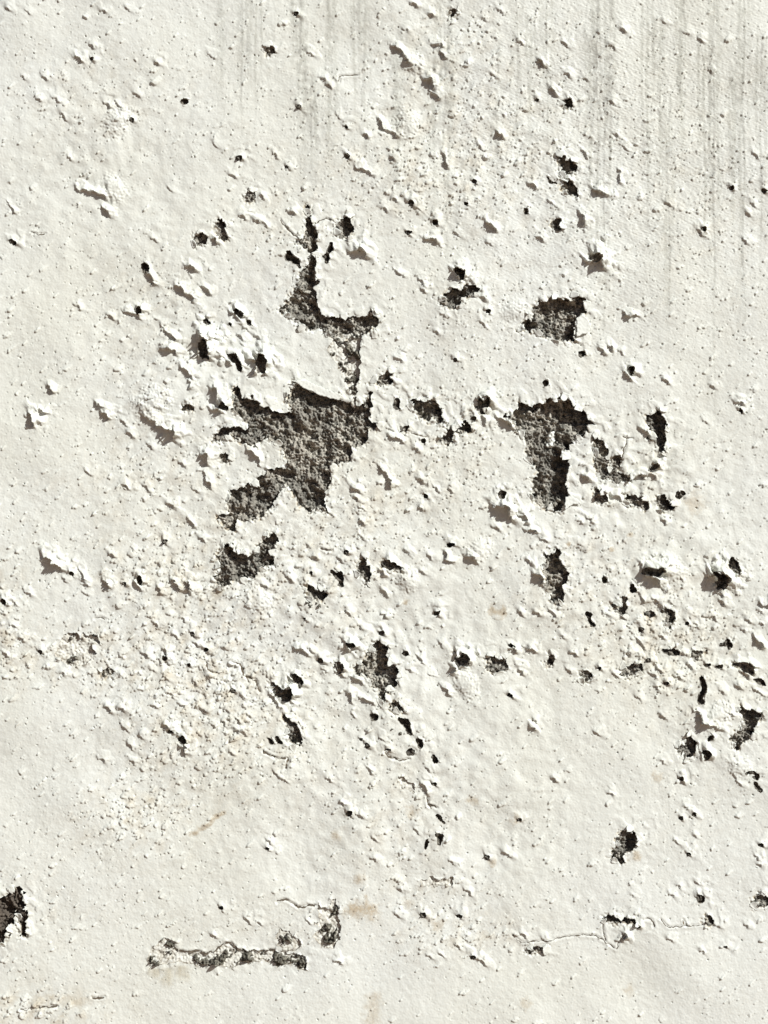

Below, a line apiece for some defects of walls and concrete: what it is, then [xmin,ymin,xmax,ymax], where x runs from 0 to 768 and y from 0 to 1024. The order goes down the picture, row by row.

spalling [159,205,642,622]
spalling [627,407,670,481]
spalling [293,557,768,785]
spalling [610,825,641,864]
spalling [0,885,31,946]
peeling [147,898,347,971]